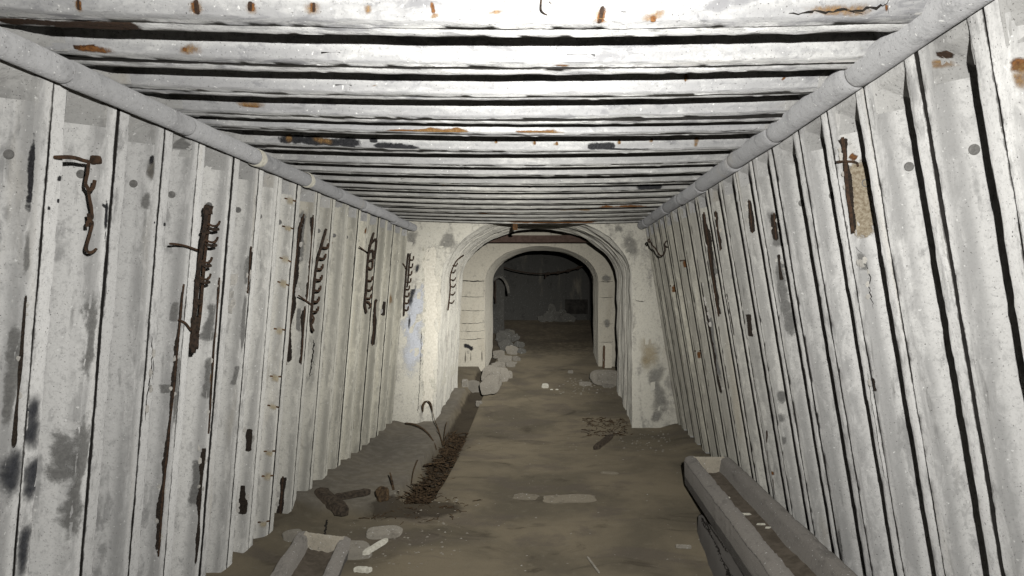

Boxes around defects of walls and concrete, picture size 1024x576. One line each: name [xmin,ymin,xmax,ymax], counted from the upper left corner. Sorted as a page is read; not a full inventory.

crack [789,0,889,15]
corrosion [73,44,111,53]
corrosion [1011,58,1024,86]
spalling [836,137,875,307]
damp [83,303,97,371]
damp [645,348,665,421]
damp [47,426,89,533]